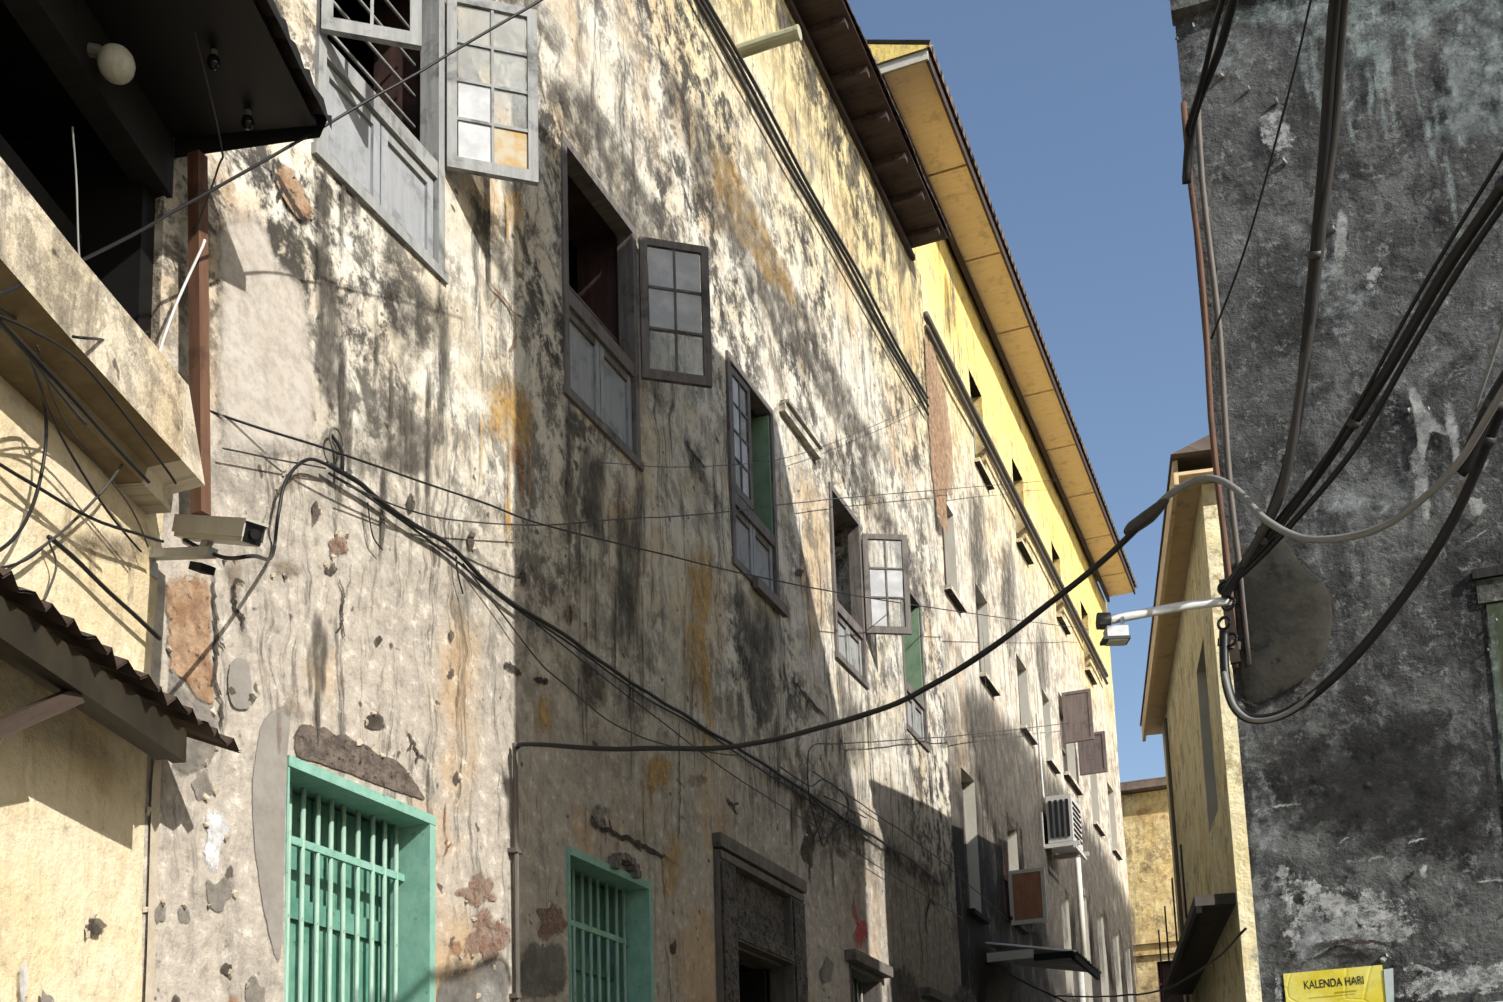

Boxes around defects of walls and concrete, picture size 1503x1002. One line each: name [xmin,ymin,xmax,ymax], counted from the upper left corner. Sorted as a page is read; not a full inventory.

spalling [277,165,314,220]
damp [548,81,676,249]
damp [777,0,861,226]
damp [1257,0,1328,102]
damp [1346,0,1503,208]
damp [664,60,925,601]
corrosion [480,383,533,529]
flaking render [924,336,953,532]
flaking render [143,573,257,1002]
spalling [294,711,425,800]
flaking render [221,963,265,1002]
flaking render [453,871,510,999]